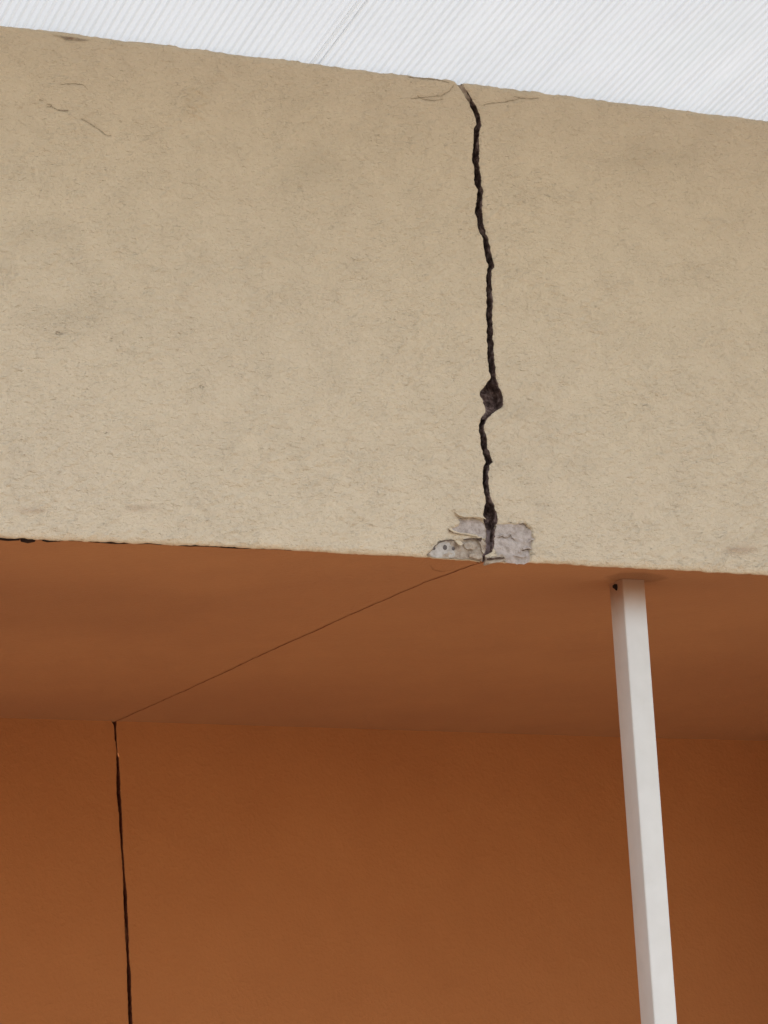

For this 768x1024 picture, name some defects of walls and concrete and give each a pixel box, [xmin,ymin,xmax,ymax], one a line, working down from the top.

crack [113,77,535,1024]
flaking render [427,511,534,566]